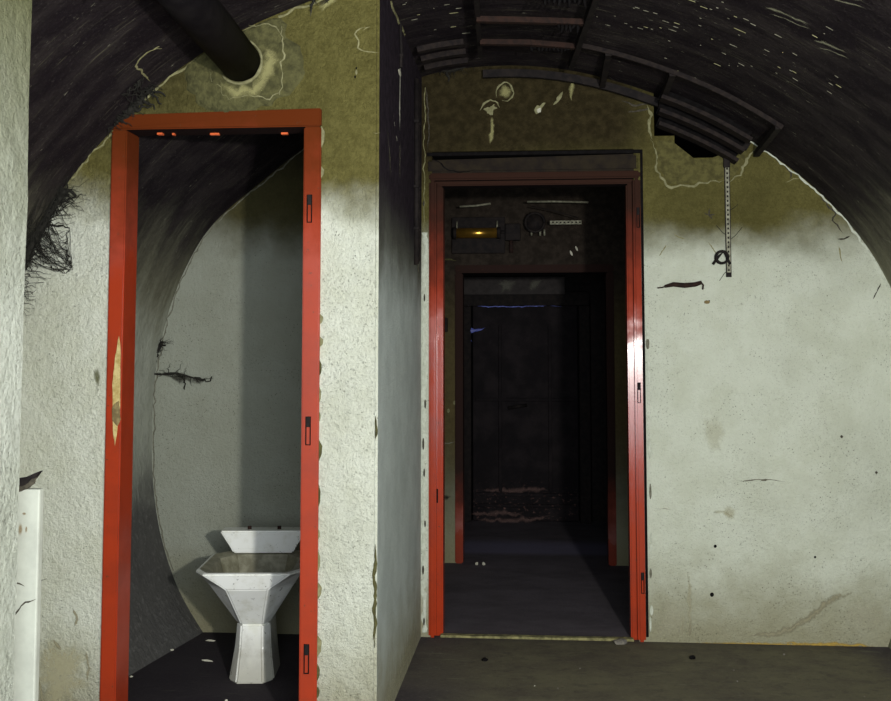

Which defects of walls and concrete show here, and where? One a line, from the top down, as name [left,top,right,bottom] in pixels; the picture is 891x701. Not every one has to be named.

peeling [480,82,514,142]
peeling [534,92,563,114]
peeling [112,338,121,442]